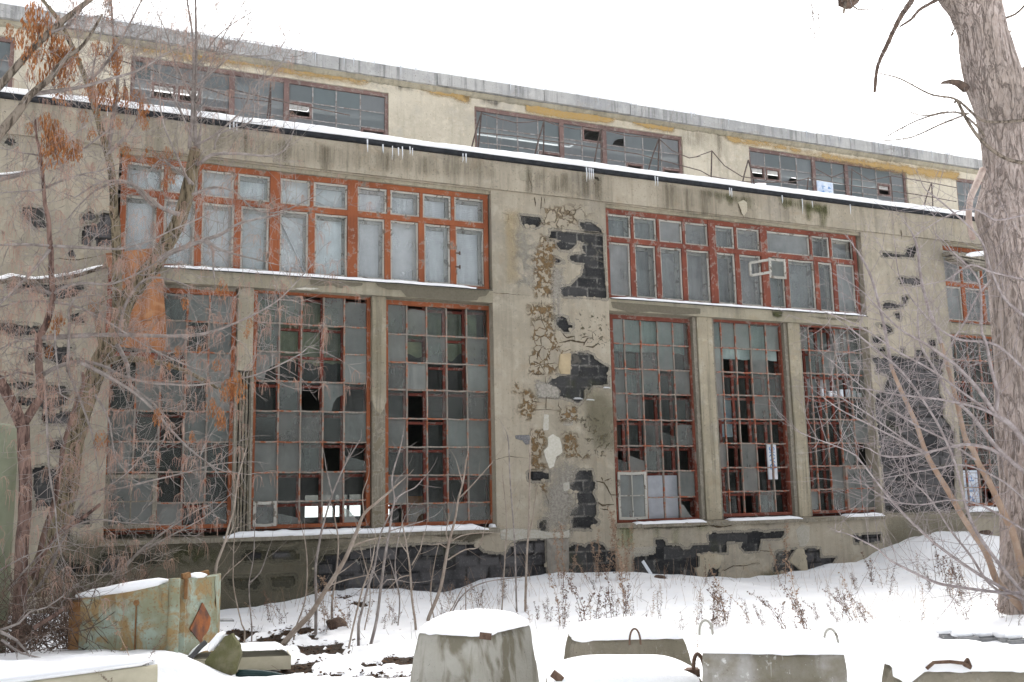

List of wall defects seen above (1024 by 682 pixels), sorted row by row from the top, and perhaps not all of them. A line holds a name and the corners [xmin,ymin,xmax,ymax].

flaking render [19,203,50,232]
flaking render [68,208,112,258]
flaking render [518,213,609,301]
spalling [879,243,917,260]
crack [526,300,599,410]
flaking render [546,351,611,407]
flaking render [871,275,957,515]
flaking render [526,468,551,484]
flaking render [568,468,838,577]